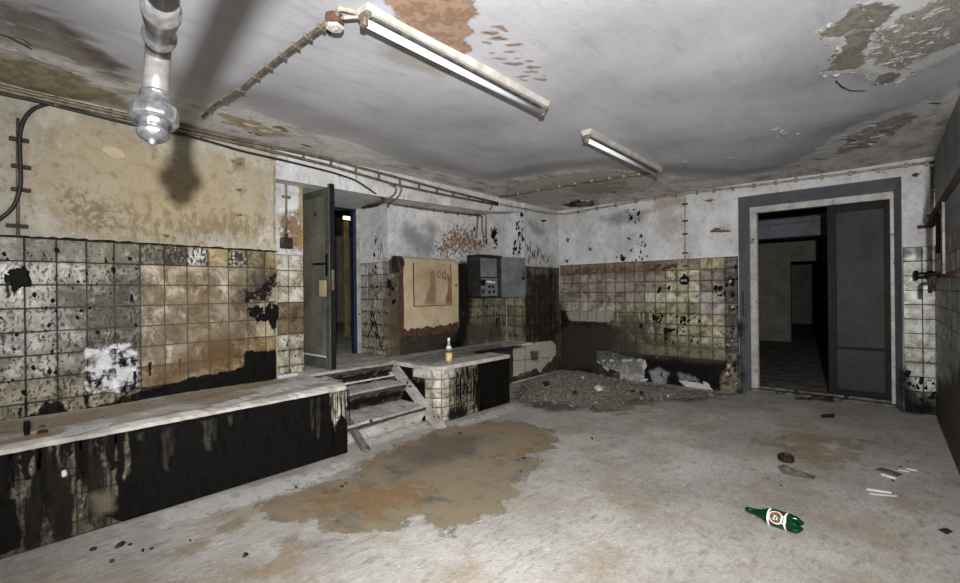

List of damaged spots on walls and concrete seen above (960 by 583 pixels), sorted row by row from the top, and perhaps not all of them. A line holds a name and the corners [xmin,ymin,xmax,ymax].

peeling [817,0,960,92]
peeling [785,100,941,167]
damp [35,121,269,238]
spalling [597,351,648,381]
damp [0,432,126,505]